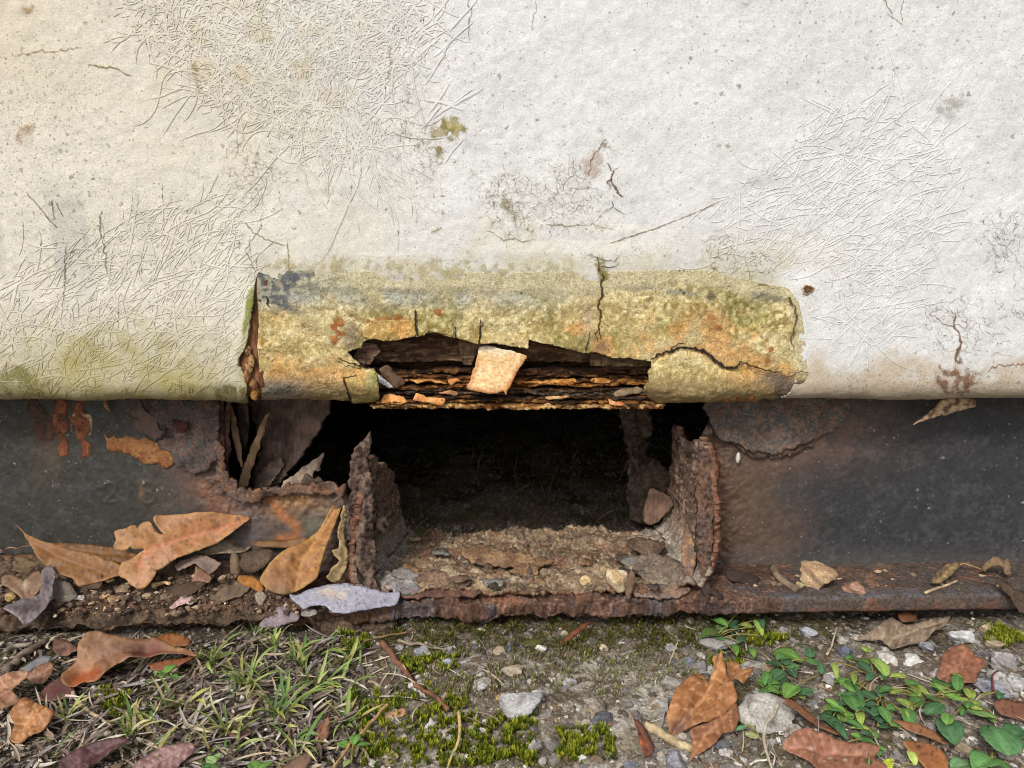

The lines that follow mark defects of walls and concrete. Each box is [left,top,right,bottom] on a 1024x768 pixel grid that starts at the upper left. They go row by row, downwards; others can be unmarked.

leakage [419,256,572,279]
crack [468,139,715,351]
crack [650,231,810,377]
peeling [480,327,529,349]
peeling [334,352,445,406]
rust [937,358,976,395]
rust [27,399,91,458]
rust [678,424,714,453]
rust [347,431,553,601]
rust [615,408,697,601]